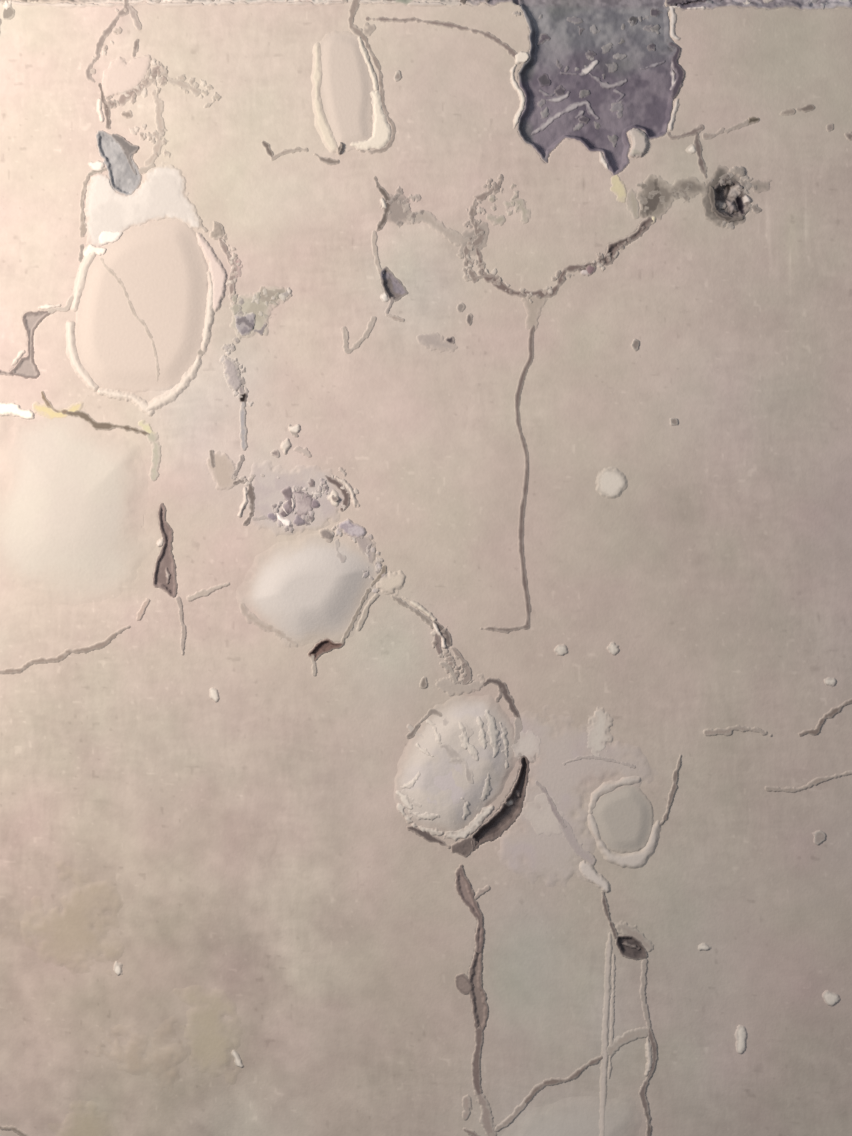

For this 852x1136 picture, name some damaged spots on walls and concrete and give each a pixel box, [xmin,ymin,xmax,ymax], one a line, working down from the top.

crack [85,0,222,166]
flaking render [0,0,852,176]
peeling [83,130,200,257]
crack [261,0,656,634]
crack [0,175,230,674]
peeling [205,337,387,594]
crack [307,570,658,1136]
crack [659,754,682,825]
crack [703,698,852,737]
crack [765,770,852,793]
crack [0,1125,29,1136]